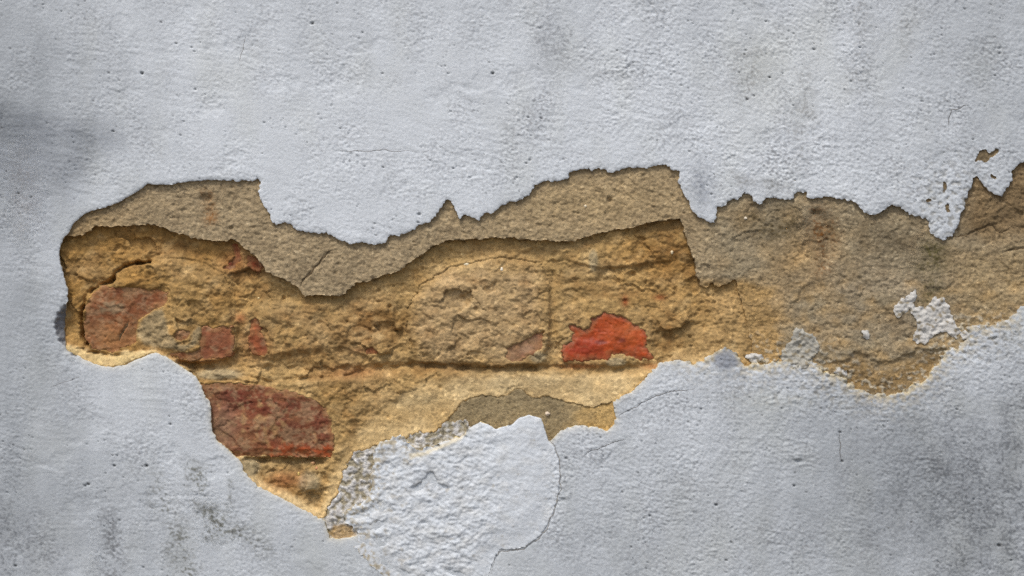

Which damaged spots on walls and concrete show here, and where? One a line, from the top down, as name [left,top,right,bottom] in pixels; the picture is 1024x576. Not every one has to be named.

flaking render [975,149,999,162]
flaking render [60,162,1024,539]
crack [588,389,692,452]
crack [490,424,562,574]